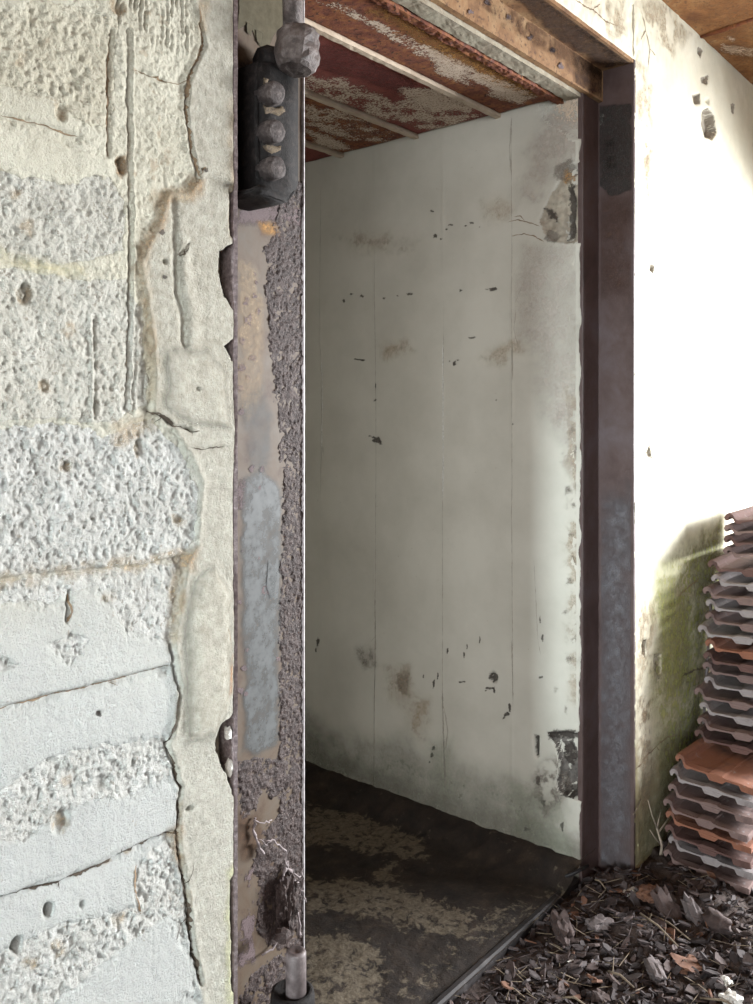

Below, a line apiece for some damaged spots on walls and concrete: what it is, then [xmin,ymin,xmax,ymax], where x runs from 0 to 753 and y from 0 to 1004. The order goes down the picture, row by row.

crack [135,5,207,176]
corrosion [318,46,415,91]
corrosion [372,10,536,96]
corrosion [484,0,629,94]
spalling [692,75,716,140]
corrosion [238,203,302,234]
spalling [540,159,578,244]
spalling [548,730,578,799]
crack [2,693,200,984]
corrosion [238,817,264,967]